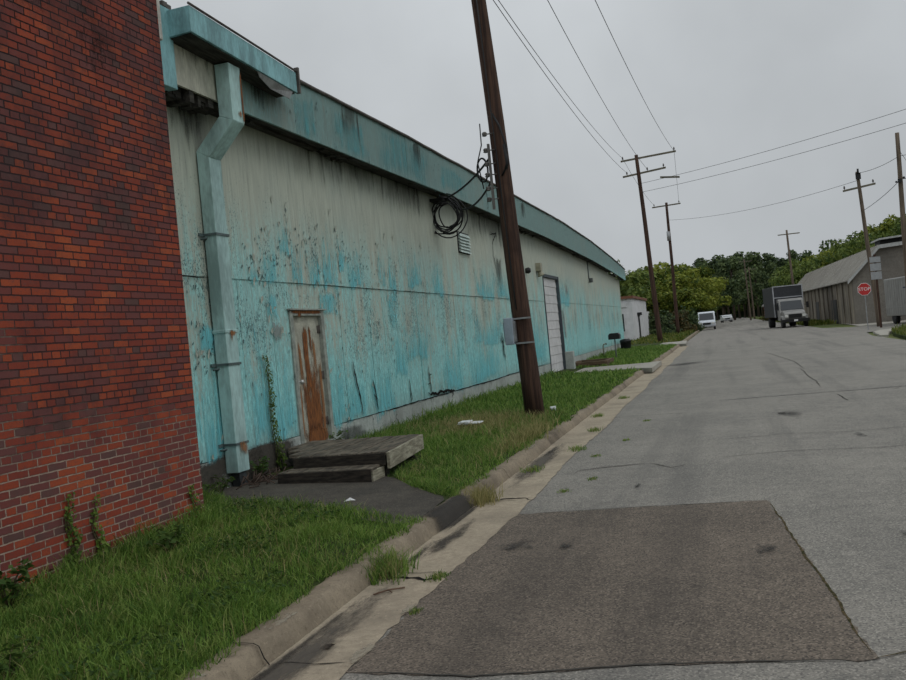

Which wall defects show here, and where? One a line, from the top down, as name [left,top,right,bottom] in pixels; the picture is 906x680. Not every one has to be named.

peeling [249,202,367,339]
rust [298,326,329,441]
peeling [330,234,445,428]